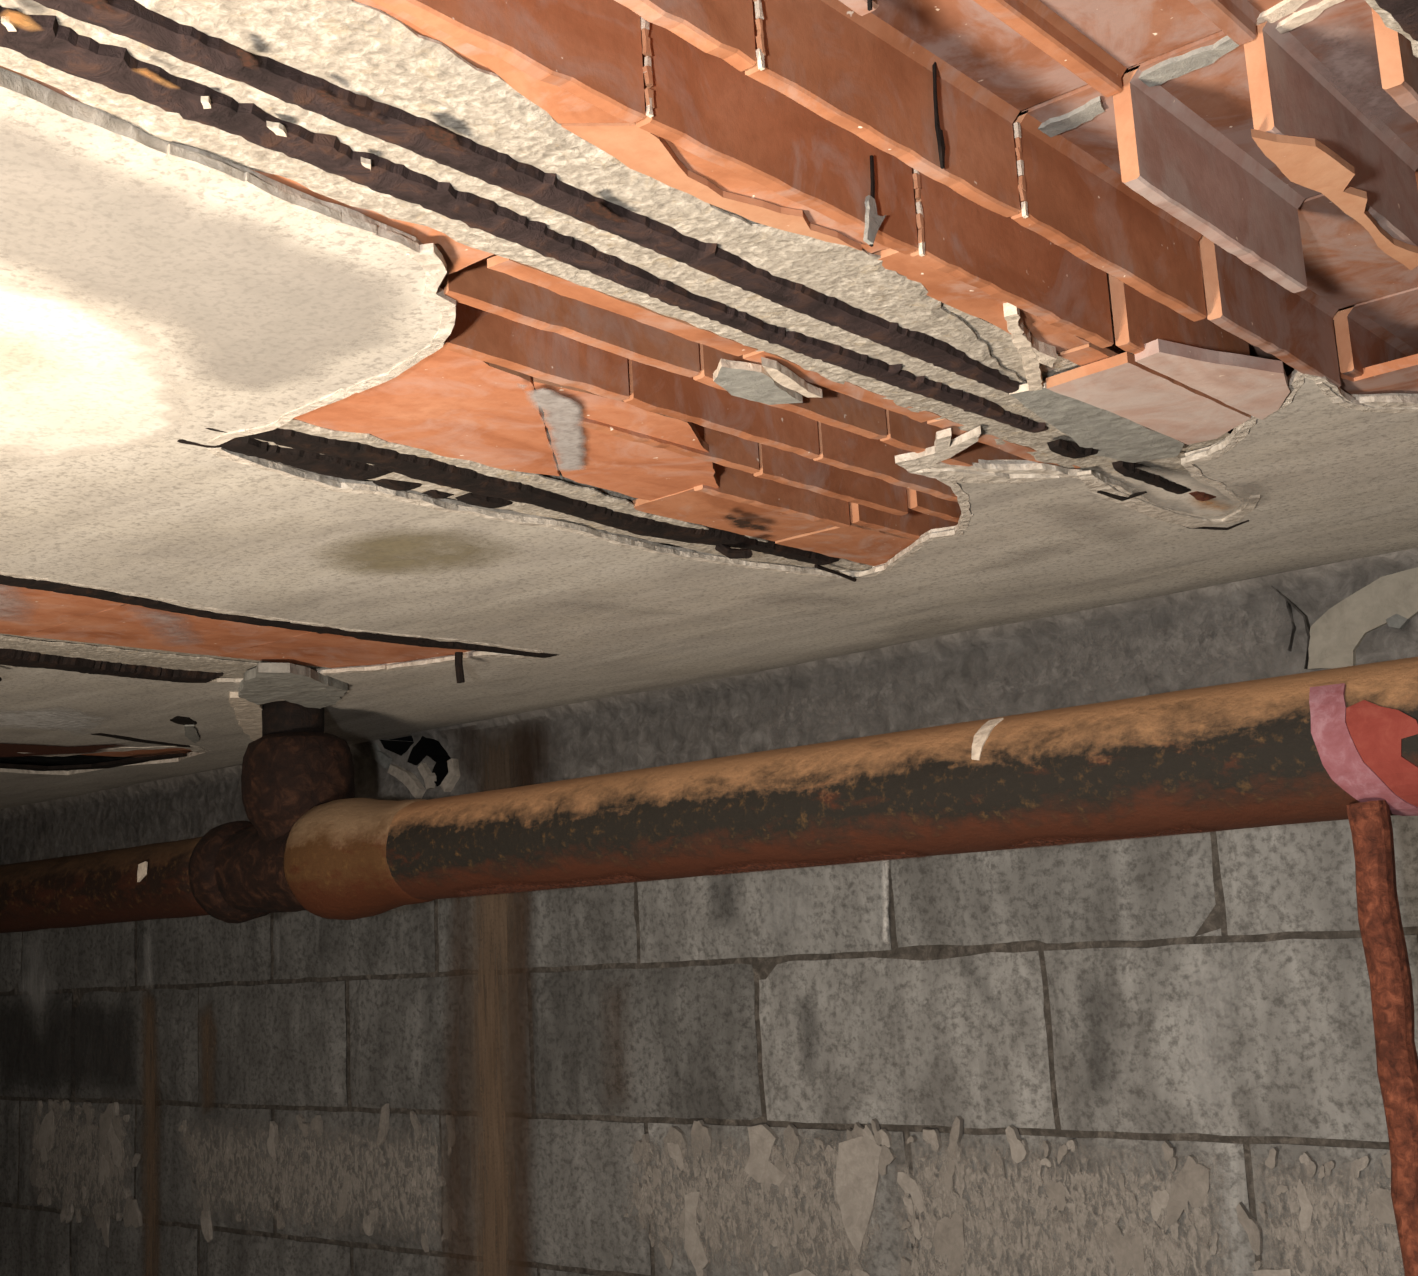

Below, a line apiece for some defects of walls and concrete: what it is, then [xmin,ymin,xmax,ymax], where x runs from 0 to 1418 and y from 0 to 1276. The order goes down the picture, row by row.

corrosion [4,12,33,27]
spalling [1375,0,1418,41]
corrosion [236,49,257,69]
corrosion [586,201,628,223]
spalling [0,0,1259,578]
spalling [1278,371,1418,410]
spalling [0,572,558,676]
peeling [1308,567,1418,670]
spalling [0,648,243,684]
spalling [17,716,211,757]
peeling [624,1116,1228,1276]
peeling [1236,1147,1405,1276]